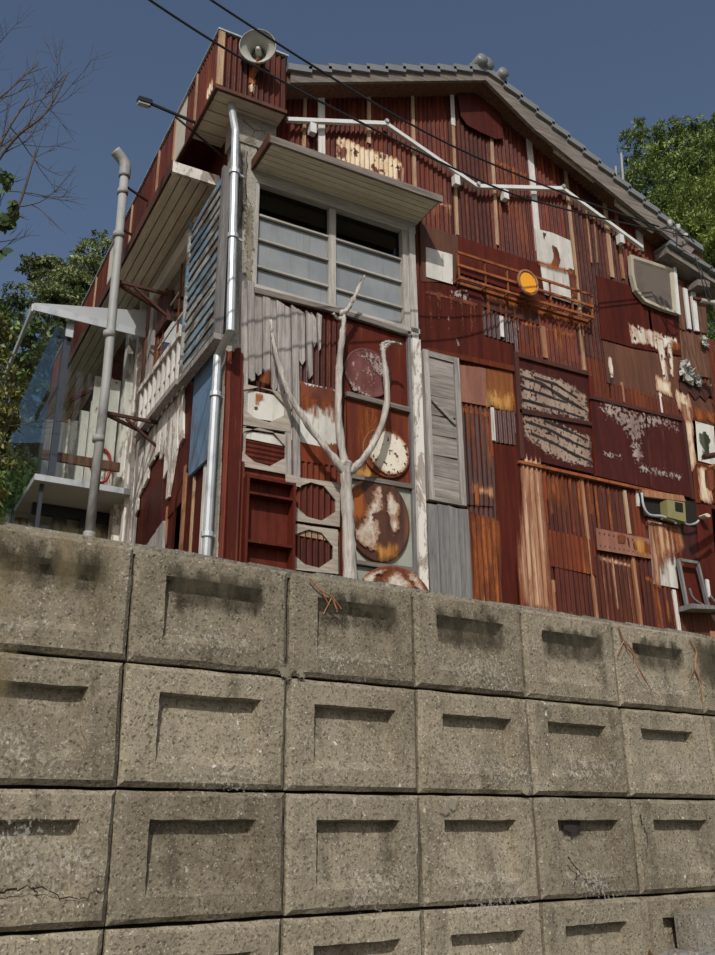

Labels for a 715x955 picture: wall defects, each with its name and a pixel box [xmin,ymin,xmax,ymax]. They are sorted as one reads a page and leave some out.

peeling [336,136,404,182]
rust [291,381,345,430]
peeling [369,431,409,474]
peeling [517,324,714,610]
peeling [352,486,424,590]
rust [546,471,684,628]
crack [0,885,105,902]